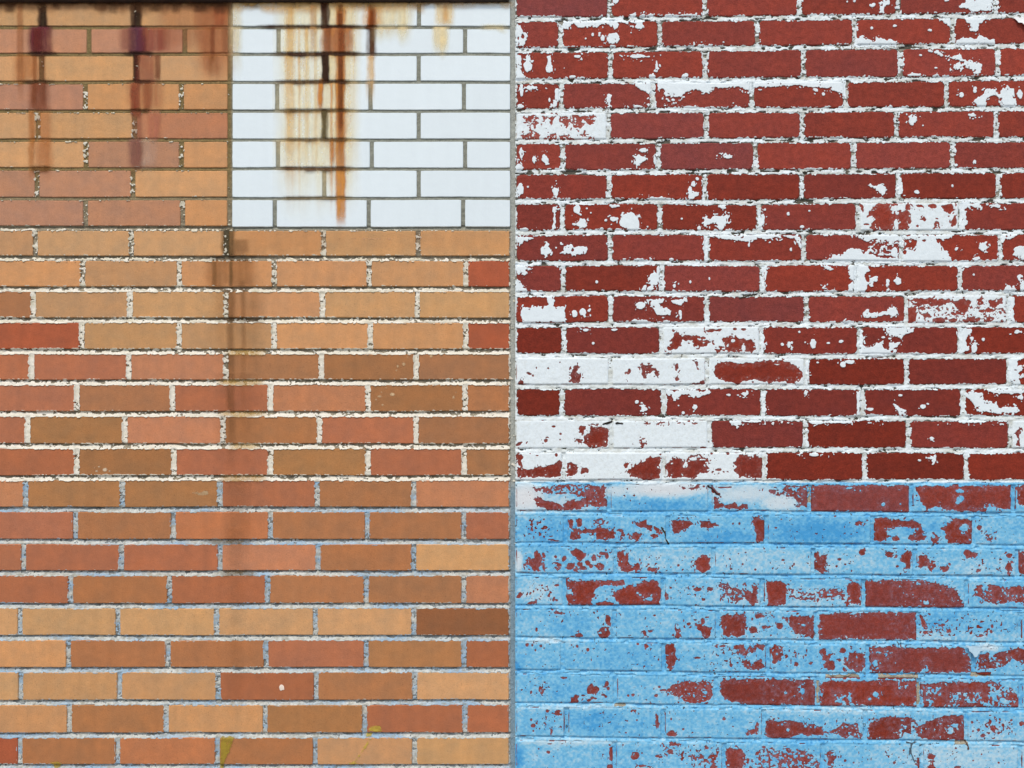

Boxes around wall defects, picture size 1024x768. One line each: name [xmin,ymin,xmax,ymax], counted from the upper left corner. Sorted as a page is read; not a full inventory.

corrosion [265,2,406,218]
peeling [515,180,592,258]
peeling [515,24,607,200]
peeling [631,148,659,170]
peeling [600,177,705,233]
peeling [560,11,846,111]
peeling [697,204,804,263]
peeling [854,0,911,48]
peeling [820,174,1024,367]
peeling [902,0,1023,120]
peeling [515,256,1024,768]